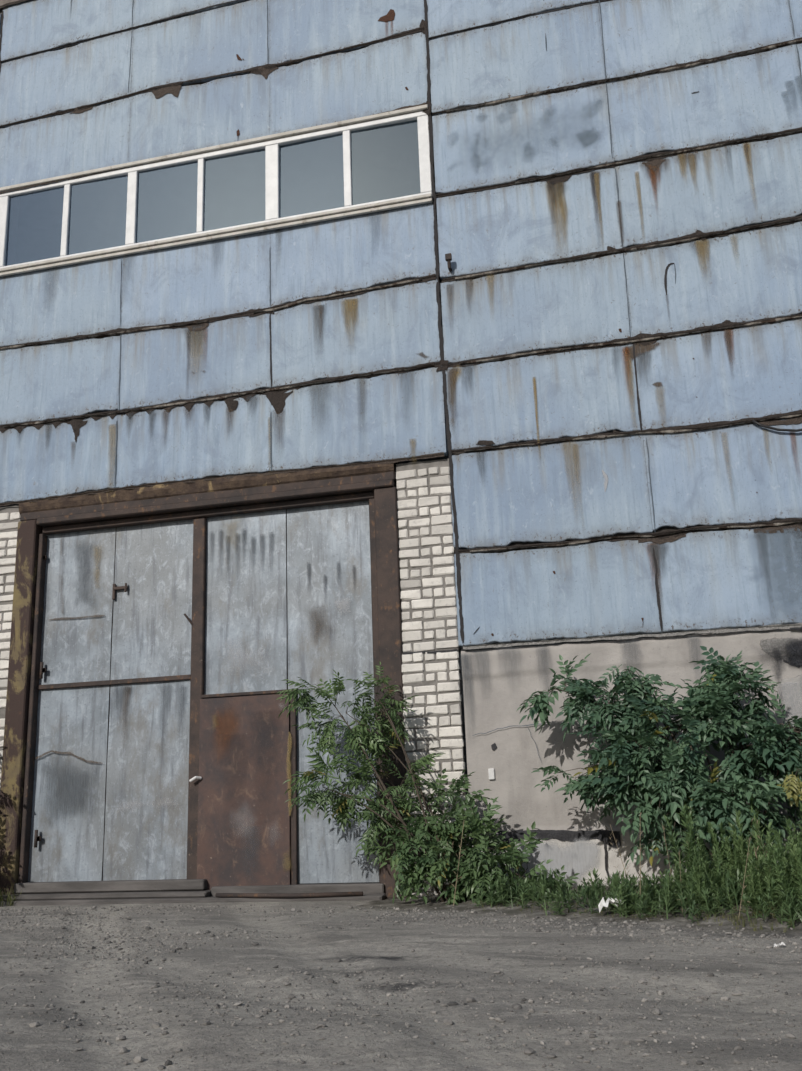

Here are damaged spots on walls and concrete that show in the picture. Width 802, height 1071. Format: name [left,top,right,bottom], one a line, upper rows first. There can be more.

rust [378,9,395,22]
rust [548,182,565,221]
rust [636,160,666,205]
water stain [775,640,802,674]